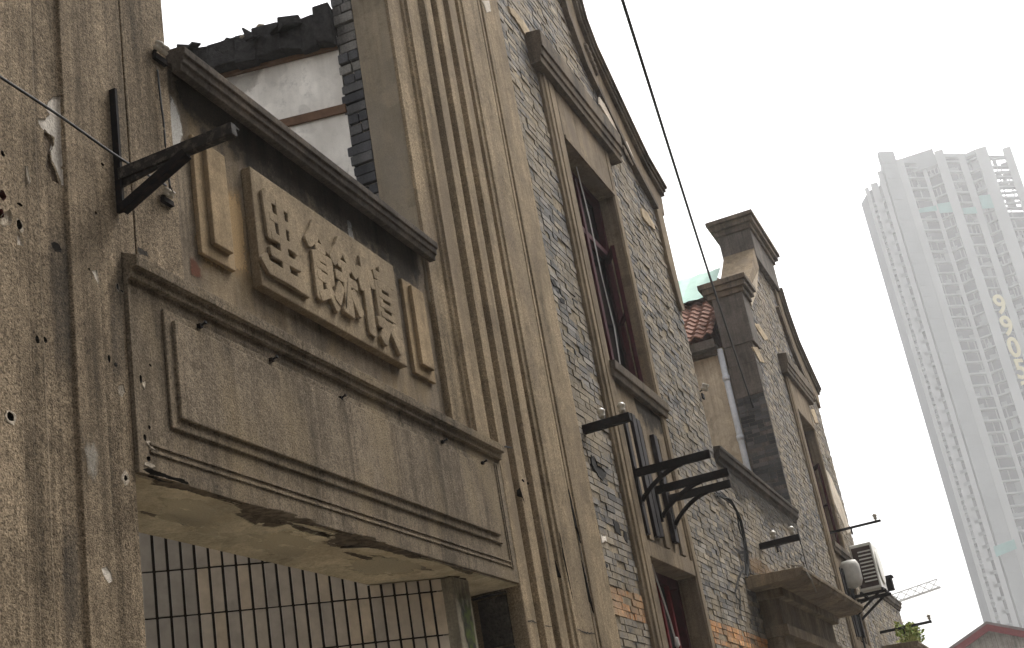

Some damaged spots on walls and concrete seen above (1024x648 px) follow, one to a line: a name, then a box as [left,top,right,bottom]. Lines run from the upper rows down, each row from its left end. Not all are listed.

spalling [38,97,63,185]
peeling [144,461,433,571]